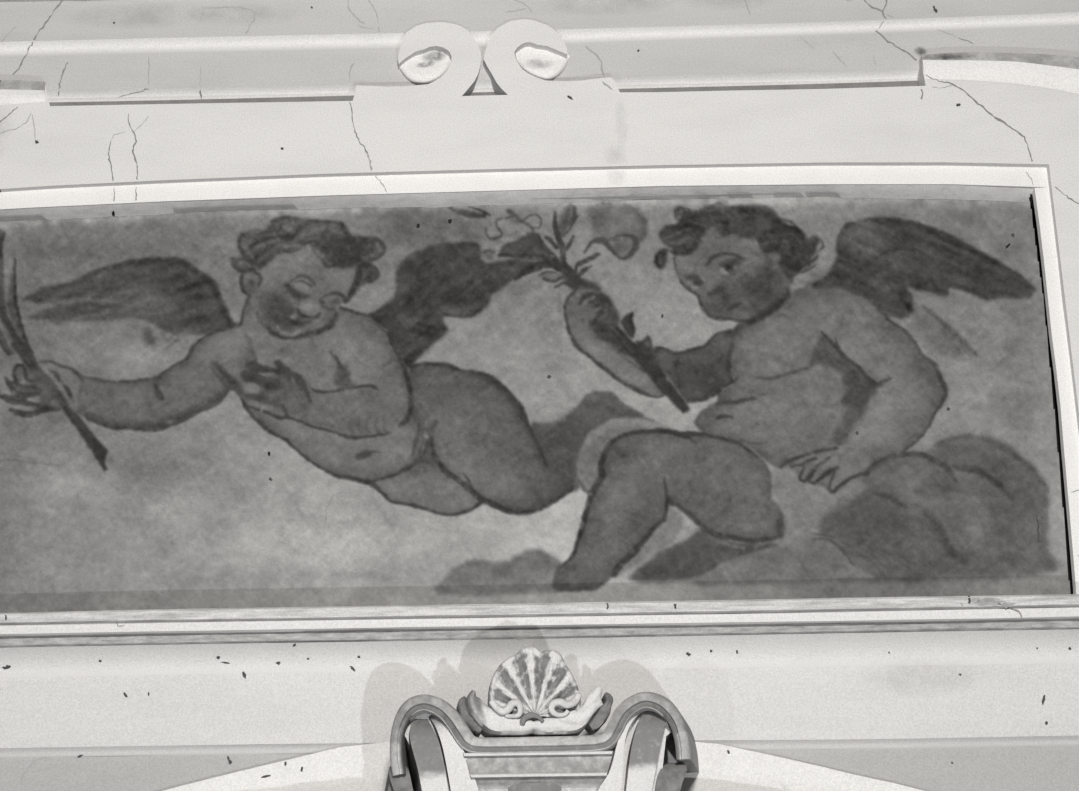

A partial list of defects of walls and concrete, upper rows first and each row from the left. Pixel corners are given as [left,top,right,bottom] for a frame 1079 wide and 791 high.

crack [0,106,36,140]
crack [0,0,63,82]
crack [108,58,150,201]
crack [349,63,387,192]
crack [847,0,1079,204]